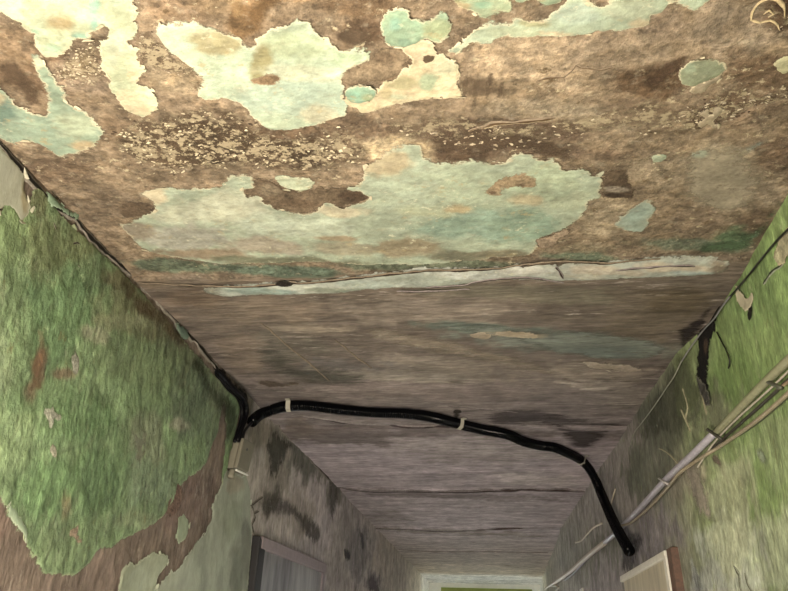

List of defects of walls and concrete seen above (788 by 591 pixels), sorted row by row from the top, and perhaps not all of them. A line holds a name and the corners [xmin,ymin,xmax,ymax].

water stain [338,29,368,45]
water stain [1,63,37,105]
water stain [645,57,685,88]
flaking render [550,56,788,146]
peeling [0,0,709,266]
water stain [436,131,561,156]
crack [0,143,695,377]
peeling [0,147,252,591]
spalling [696,306,720,406]
crack [303,452,585,493]
crack [376,525,523,533]
crack [399,547,548,555]